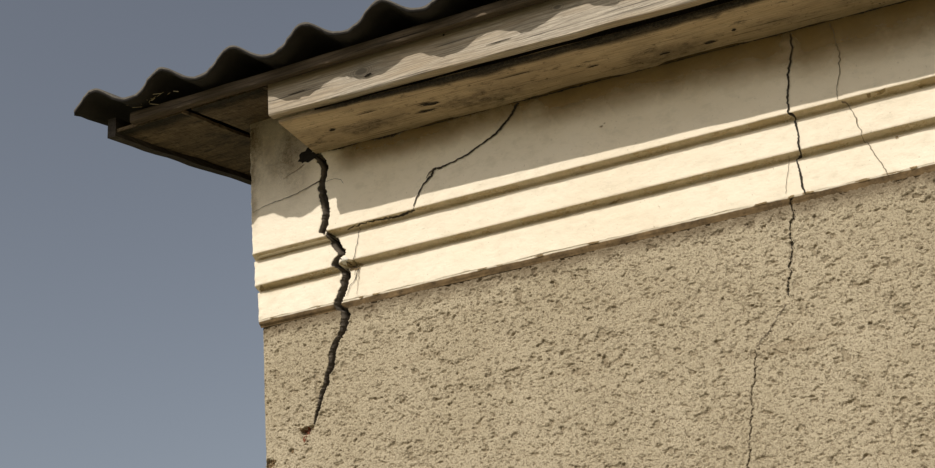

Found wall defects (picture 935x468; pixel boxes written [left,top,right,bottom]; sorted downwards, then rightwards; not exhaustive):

crack [252,0,910,467]